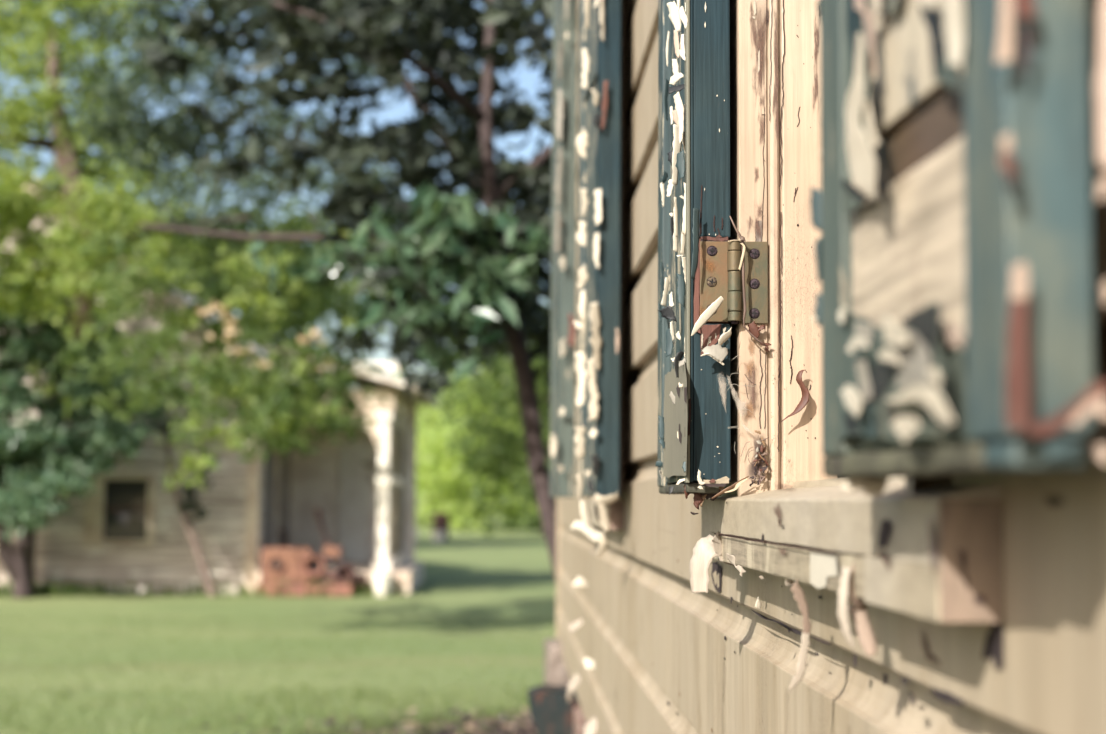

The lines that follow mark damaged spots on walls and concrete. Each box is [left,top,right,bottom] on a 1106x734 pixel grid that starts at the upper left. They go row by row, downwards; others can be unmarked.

peeling [750,0,779,138]
peeling [840,0,899,215]
peeling [918,0,964,92]
peeling [995,0,1037,70]
peeling [1095,0,1106,203]
peeling [554,0,618,557]
peeling [655,0,729,495]
rust [693,268,701,334]
peeling [797,187,822,326]
peeling [837,302,963,444]
peeling [1005,261,1106,437]
peeling [810,552,837,599]